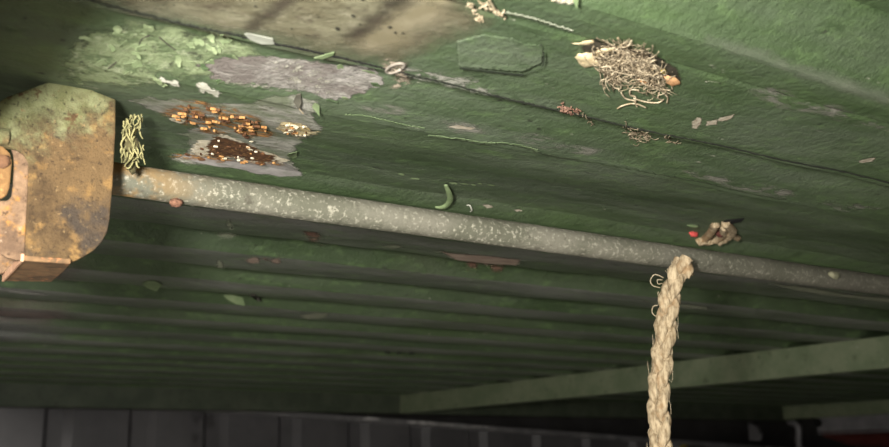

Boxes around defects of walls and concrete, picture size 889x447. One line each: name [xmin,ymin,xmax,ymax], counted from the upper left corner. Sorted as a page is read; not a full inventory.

crack [91,0,247,39]
peeling [61,21,383,114]
leakage [118,0,474,60]
crack [481,7,573,32]
corrosion [127,95,323,177]
crack [346,114,786,200]
crack [274,42,889,184]